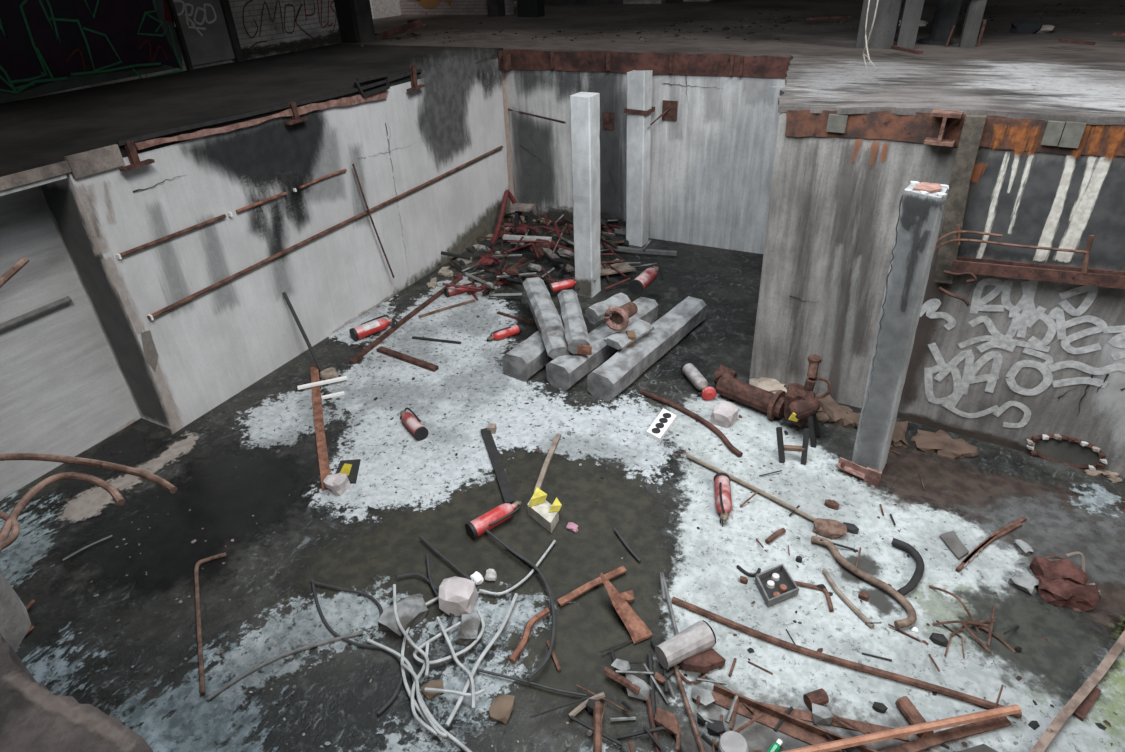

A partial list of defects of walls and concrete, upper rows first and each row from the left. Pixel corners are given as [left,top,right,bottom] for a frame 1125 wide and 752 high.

leakage [191,110,367,293]
leakage [333,51,626,333]
rust [852,139,888,167]
rust [991,123,1039,155]
leakage [957,152,1125,271]
rust [1072,124,1125,161]
leakage [0,488,68,588]
leakage [0,621,294,752]